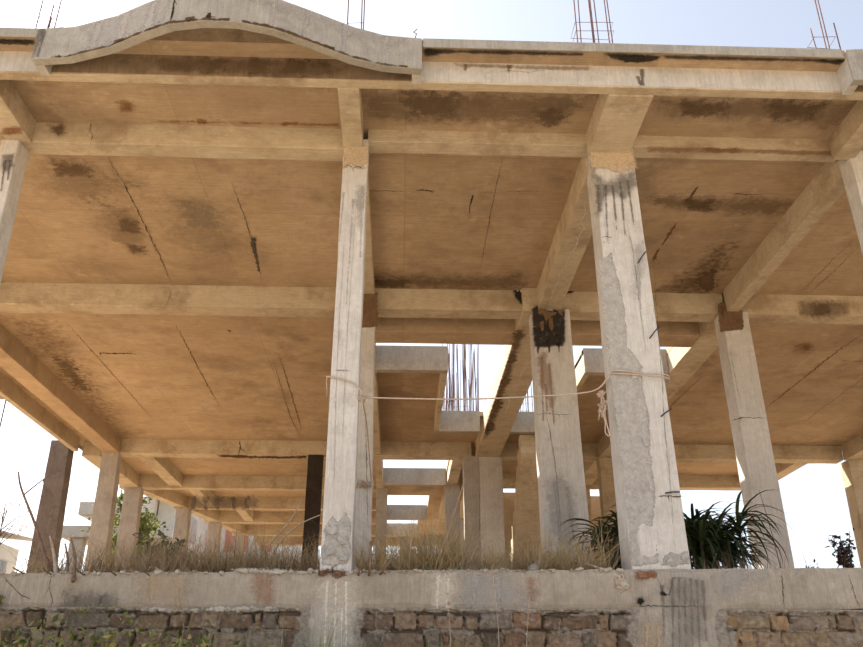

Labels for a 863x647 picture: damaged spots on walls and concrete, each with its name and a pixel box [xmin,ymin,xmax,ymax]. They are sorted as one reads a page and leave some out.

damp [1,154,14,190]
damp [54,163,85,176]
crack [469,159,537,268]
damp [590,148,636,226]
damp [685,199,713,210]
crack [109,160,219,404]
spalling [538,309,563,331]
damp [656,245,736,294]
damp [484,306,565,436]
crack [730,334,863,427]
spalling [599,253,691,593]
spalling [231,513,352,579]